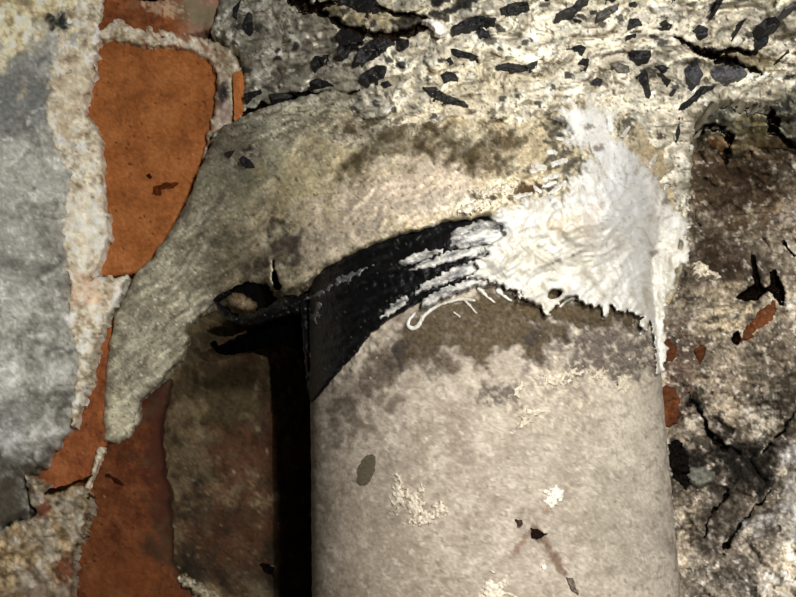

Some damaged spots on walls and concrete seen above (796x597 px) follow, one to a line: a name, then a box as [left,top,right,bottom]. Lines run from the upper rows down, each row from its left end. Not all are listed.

spalling [232,0,254,37]
crack [287,0,429,42]
crack [674,36,763,76]
spalling [224,150,255,169]
spalling [146,173,178,196]
crack [688,392,741,455]
crack [762,411,796,453]
crack [703,488,772,555]